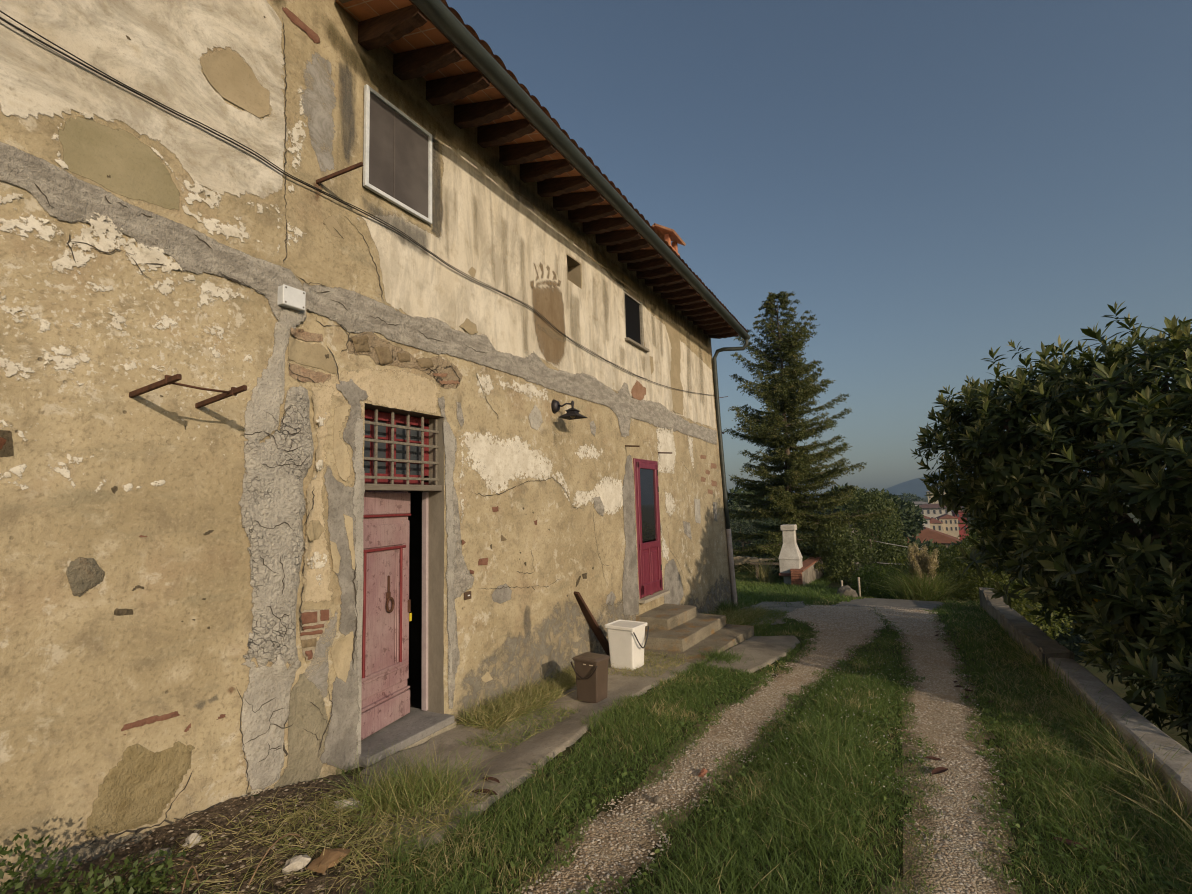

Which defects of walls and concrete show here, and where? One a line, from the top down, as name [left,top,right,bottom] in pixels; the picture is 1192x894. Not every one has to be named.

peeling [0,0,320,253]
crack [67,234,166,278]
peeling [0,212,248,309]
crack [194,234,264,294]
crack [244,7,499,529]
peeling [357,144,716,429]
spalling [289,328,548,661]
peeling [459,430,624,523]
peeling [656,426,717,494]
crack [351,559,359,664]
crack [76,557,333,849]
spalling [273,674,329,790]